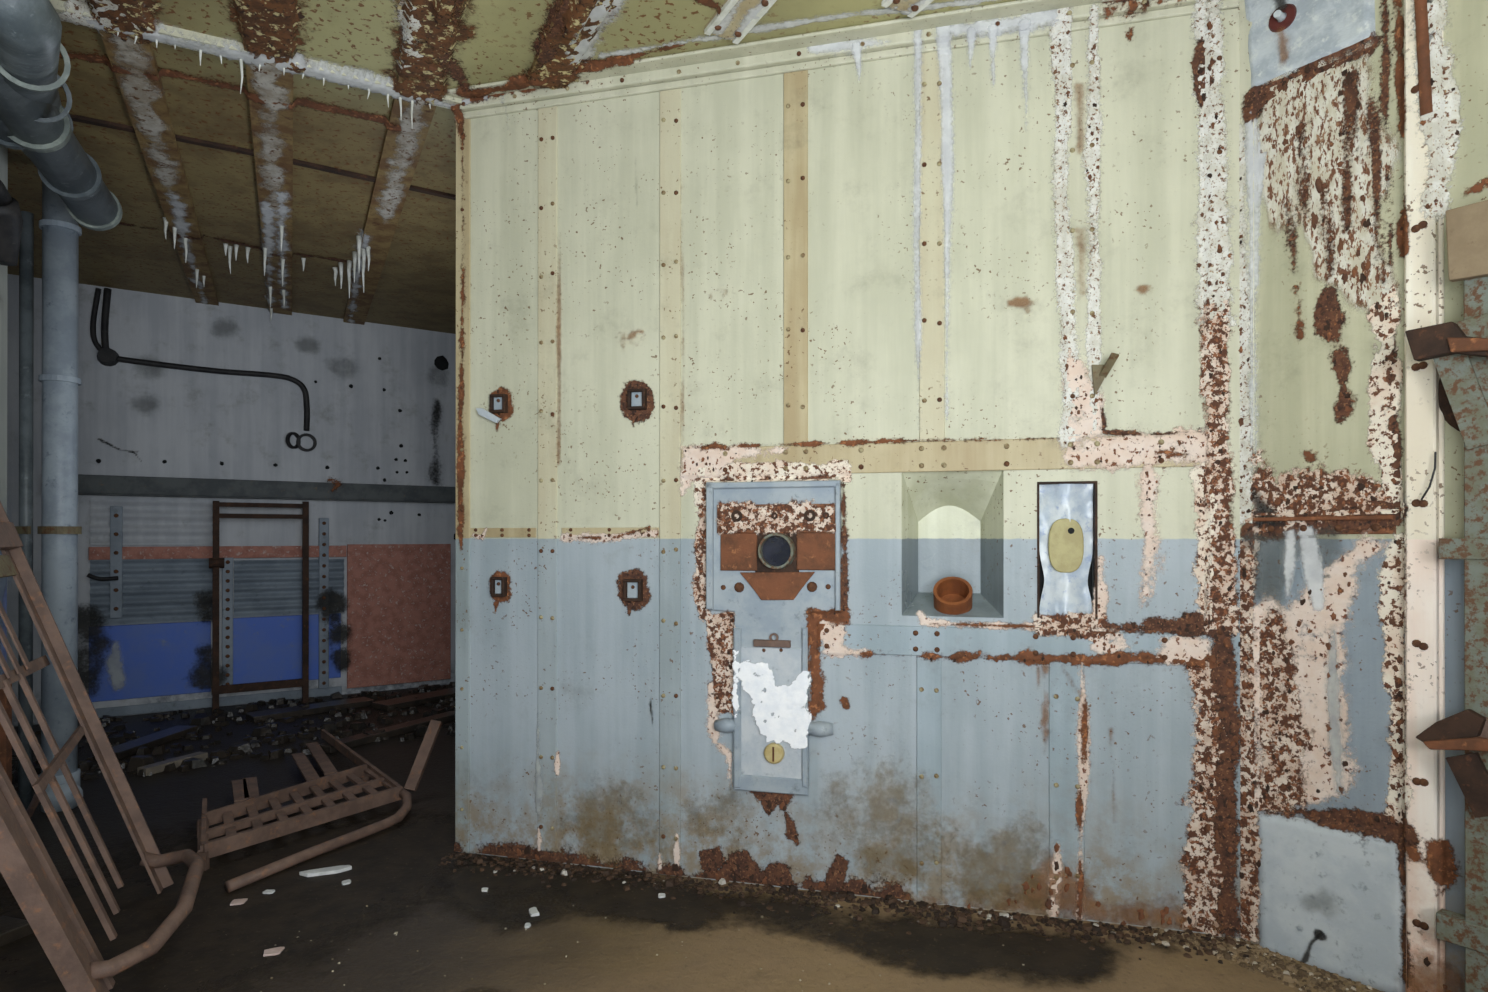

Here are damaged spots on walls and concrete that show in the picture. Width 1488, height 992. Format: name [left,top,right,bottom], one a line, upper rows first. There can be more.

damp [223,192,306,321]
damp [84,17,488,124]
damp [332,230,371,323]
rust [383,0,685,184]
damp [566,0,1058,362]
rust [1241,0,1407,138]
rust [1293,285,1358,425]
peeling [1413,0,1464,219]
peeling [1045,0,1413,943]
peeling [679,441,852,781]
rust [806,482,851,721]
rust [920,591,1461,992]